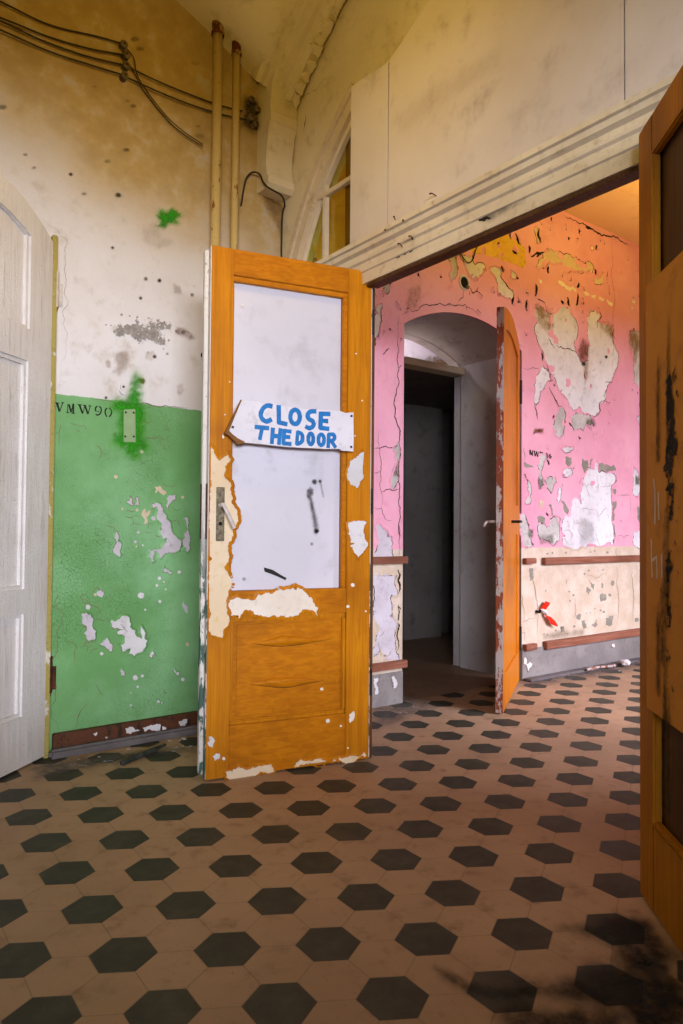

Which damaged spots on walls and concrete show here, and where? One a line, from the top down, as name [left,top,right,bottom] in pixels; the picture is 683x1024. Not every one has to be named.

crack [374,217,639,658]
peeling [448,225,640,555]
peeling [79,589,158,706]
peeling [112,486,191,603]
peeling [345,518,401,662]